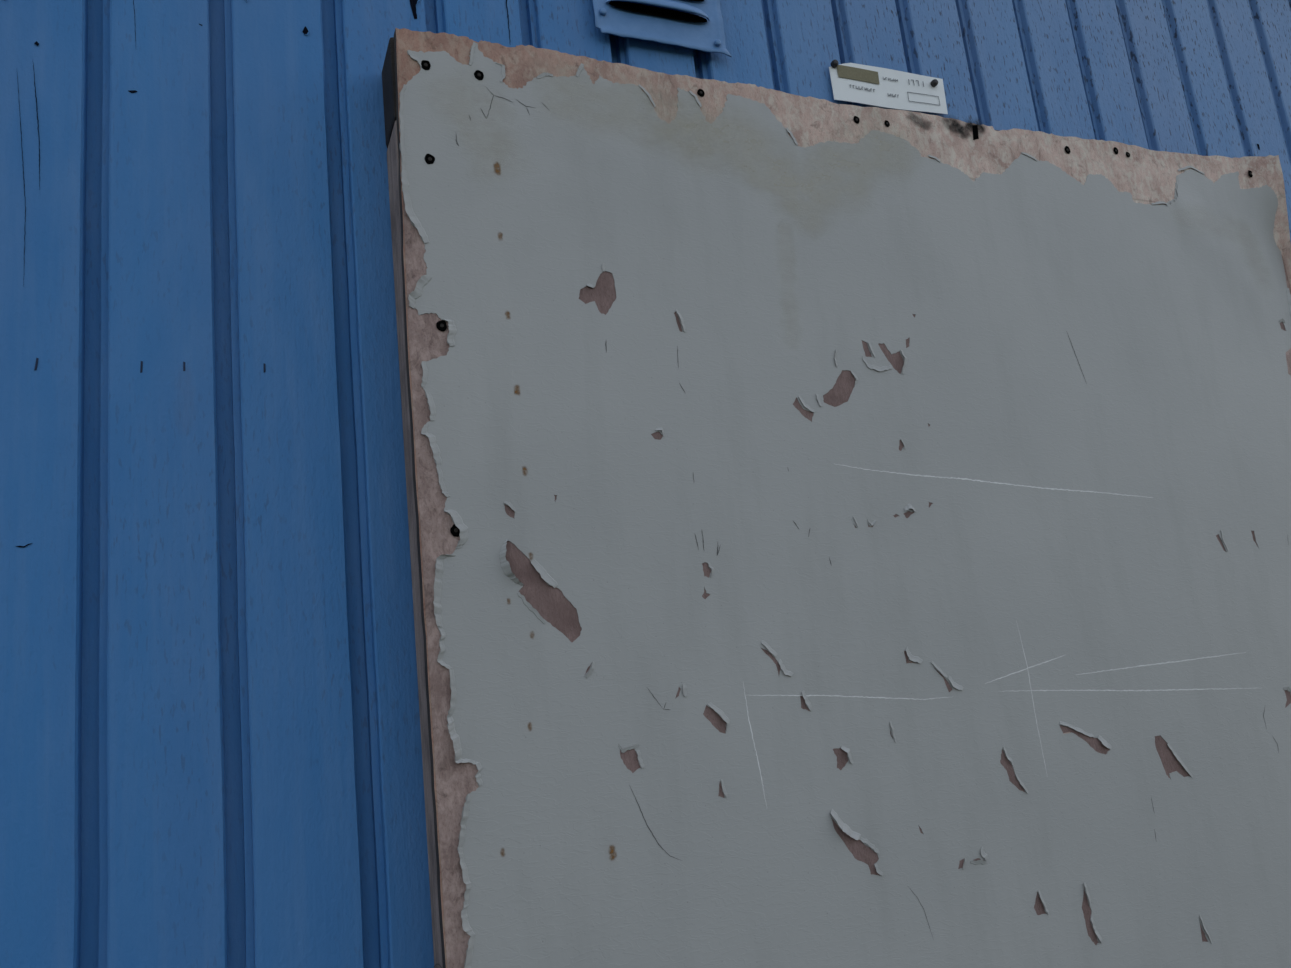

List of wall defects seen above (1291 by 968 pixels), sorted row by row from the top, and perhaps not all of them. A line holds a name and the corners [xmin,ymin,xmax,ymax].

peeling [396,0,1284,968]